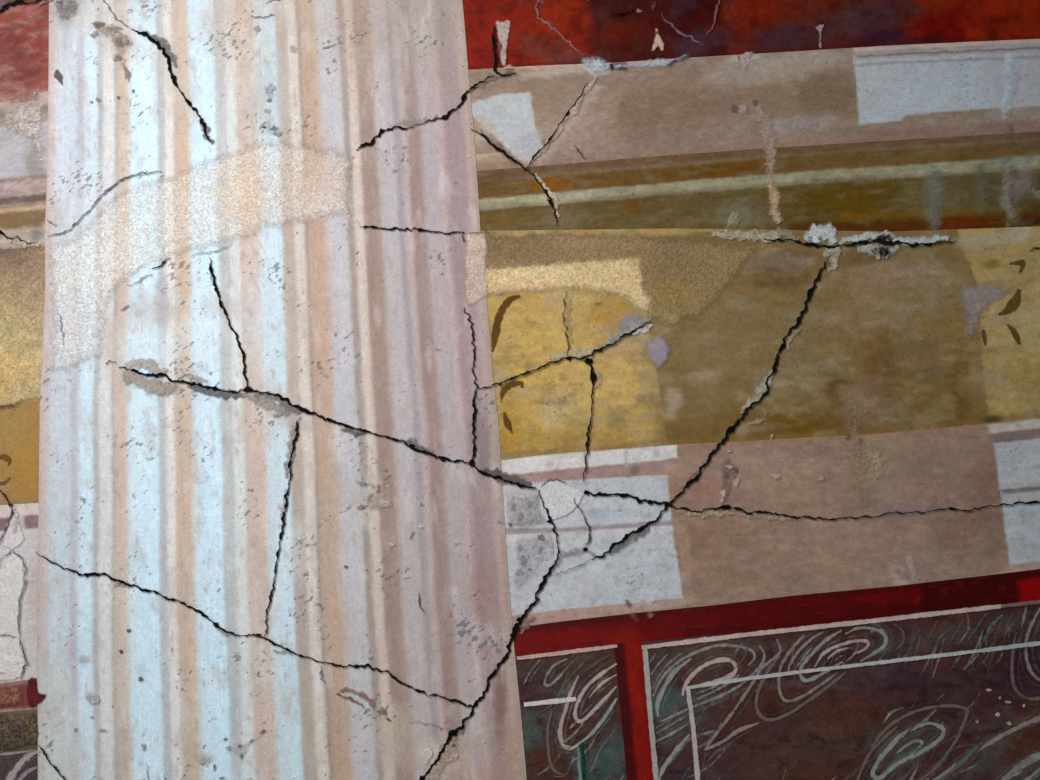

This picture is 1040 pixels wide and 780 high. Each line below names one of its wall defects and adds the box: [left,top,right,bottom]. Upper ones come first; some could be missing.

crack [0,0,53,12]
crack [612,0,720,45]
crack [103,0,214,144]
crack [356,0,597,225]
crack [0,170,162,248]
crack [348,215,494,242]
crack [0,223,1040,780]